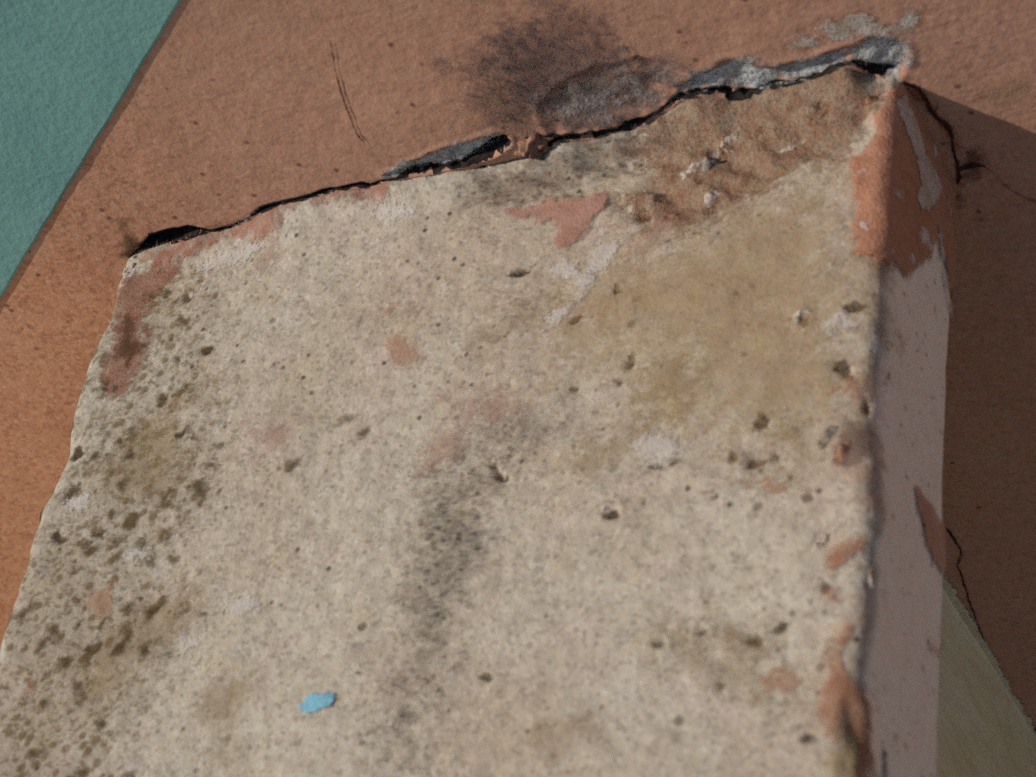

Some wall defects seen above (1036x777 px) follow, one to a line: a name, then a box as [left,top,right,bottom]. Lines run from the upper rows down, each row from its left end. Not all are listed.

flaking render [381,133,511,179]
crack [128,60,1036,258]
peeling [531,37,957,313]
peeling [917,486,946,575]
crack [946,528,983,639]